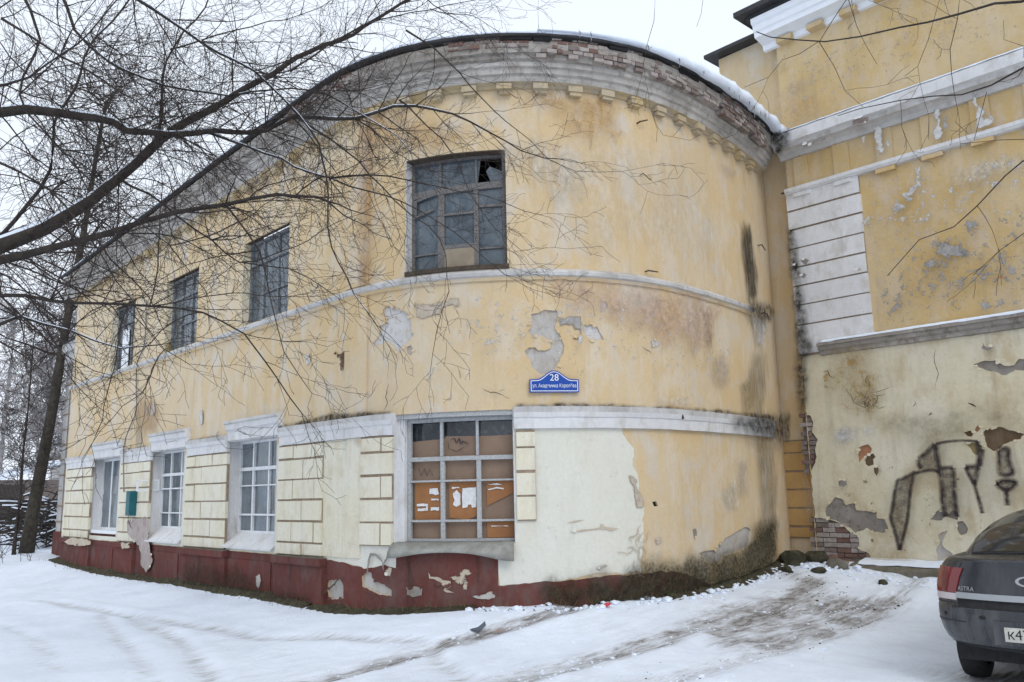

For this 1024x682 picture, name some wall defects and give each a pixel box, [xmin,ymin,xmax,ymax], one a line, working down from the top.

peeling [854,144,1024,322]
leakage [743,225,774,343]
leakage [788,230,811,410]
spalling [975,344,1024,375]
spalling [799,413,818,474]
peeling [855,444,898,483]
spalling [964,425,1024,454]
peeling [120,516,152,572]
spalling [809,478,891,562]
spalling [326,576,344,601]
peeling [364,567,392,595]
peeling [407,569,497,600]